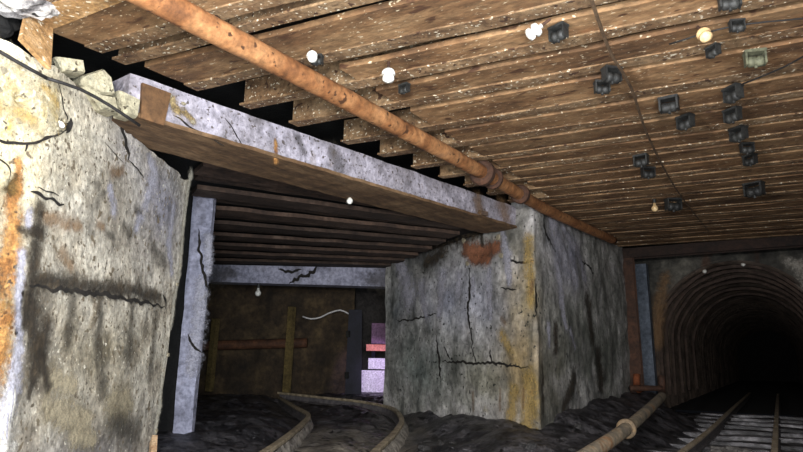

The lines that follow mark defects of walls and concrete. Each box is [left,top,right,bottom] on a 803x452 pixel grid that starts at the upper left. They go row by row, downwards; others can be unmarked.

crack [0,84,73,182]
crack [105,127,144,177]
rust [0,157,23,383]
crack [29,284,167,309]
crack [197,229,211,294]
crack [279,266,317,284]
crack [398,313,436,322]
crack [436,268,529,382]